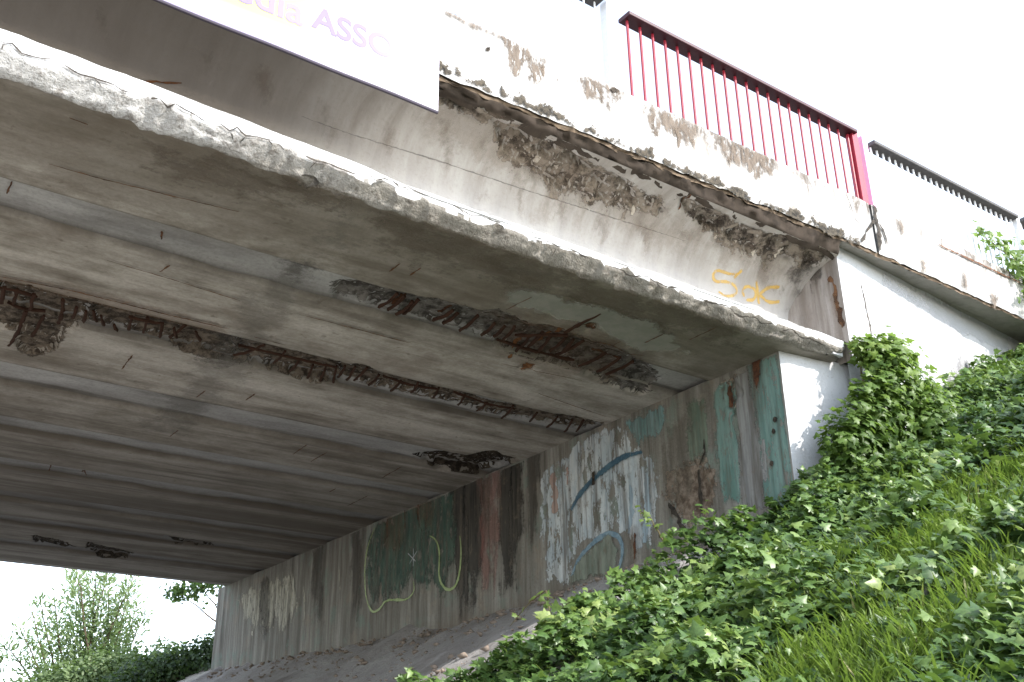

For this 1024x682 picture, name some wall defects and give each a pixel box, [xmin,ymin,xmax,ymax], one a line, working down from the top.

spalling [438,90,833,272]
peeling [0,279,792,604]
peeling [238,572,305,636]
damp [449,478,483,615]
damp [498,461,524,592]